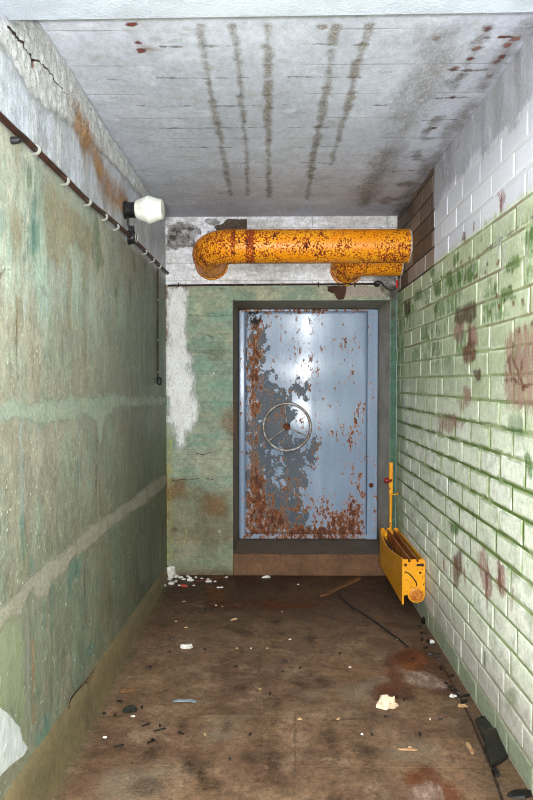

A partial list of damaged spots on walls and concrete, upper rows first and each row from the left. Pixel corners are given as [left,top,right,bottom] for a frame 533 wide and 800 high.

crack [7,26,65,93]
rust [75,109,128,209]
damp [423,33,533,206]
damp [166,286,199,449]
rust [454,302,481,381]
rust [505,322,533,409]
rust [443,550,465,587]
rust [479,547,513,596]
rust [373,648,455,700]